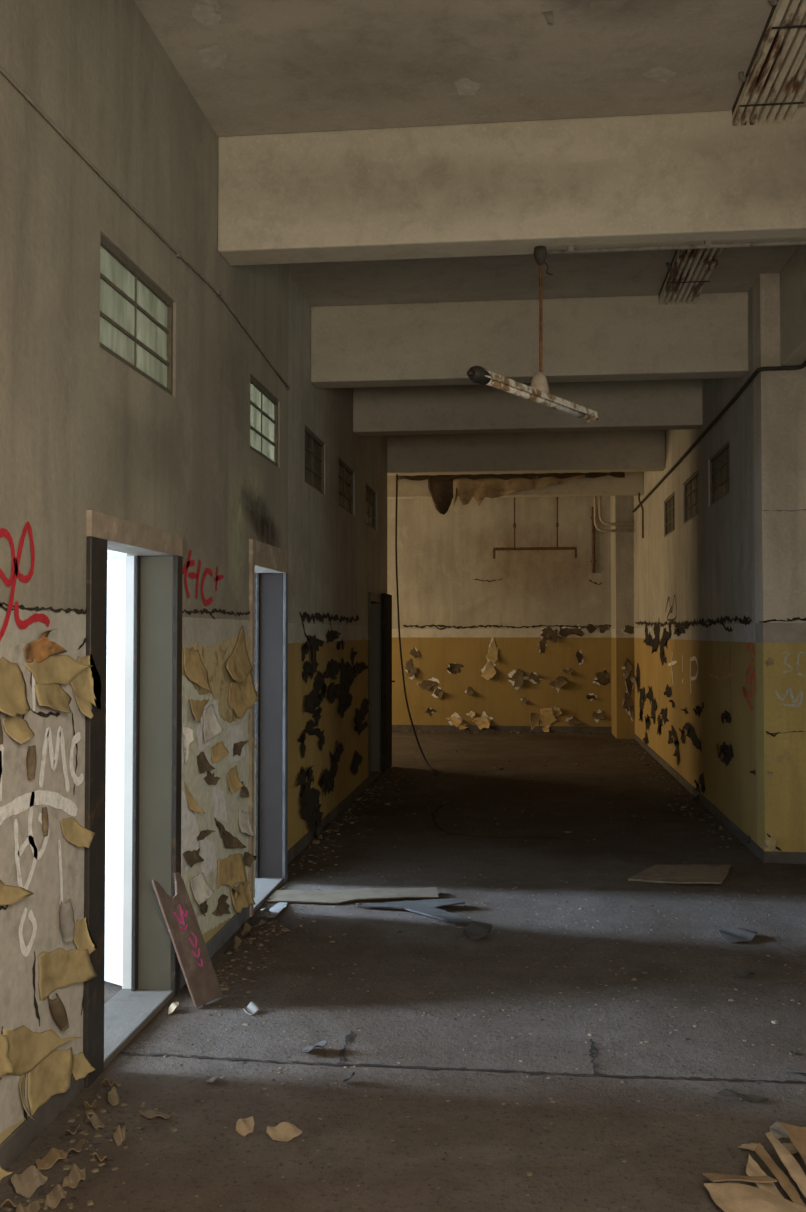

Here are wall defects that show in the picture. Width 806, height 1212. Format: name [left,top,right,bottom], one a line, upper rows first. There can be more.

peeling [0,629,101,1134]
peeling [181,626,259,935]
peeling [296,629,369,839]
peeling [405,648,493,730]
peeling [481,620,704,765]